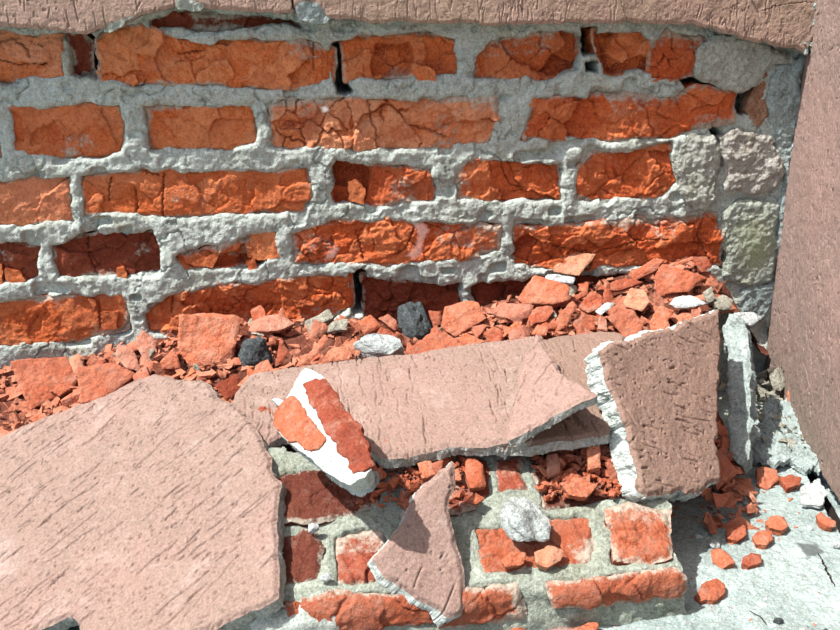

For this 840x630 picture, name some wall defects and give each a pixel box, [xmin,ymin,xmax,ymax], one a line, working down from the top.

spalling [0,0,805,406]
spalling [258,398,283,414]
spalling [417,460,436,482]
spalling [465,456,486,506]
spalling [546,445,601,501]
spalling [713,395,836,532]
spalling [501,545,564,571]
spalling [710,515,788,570]